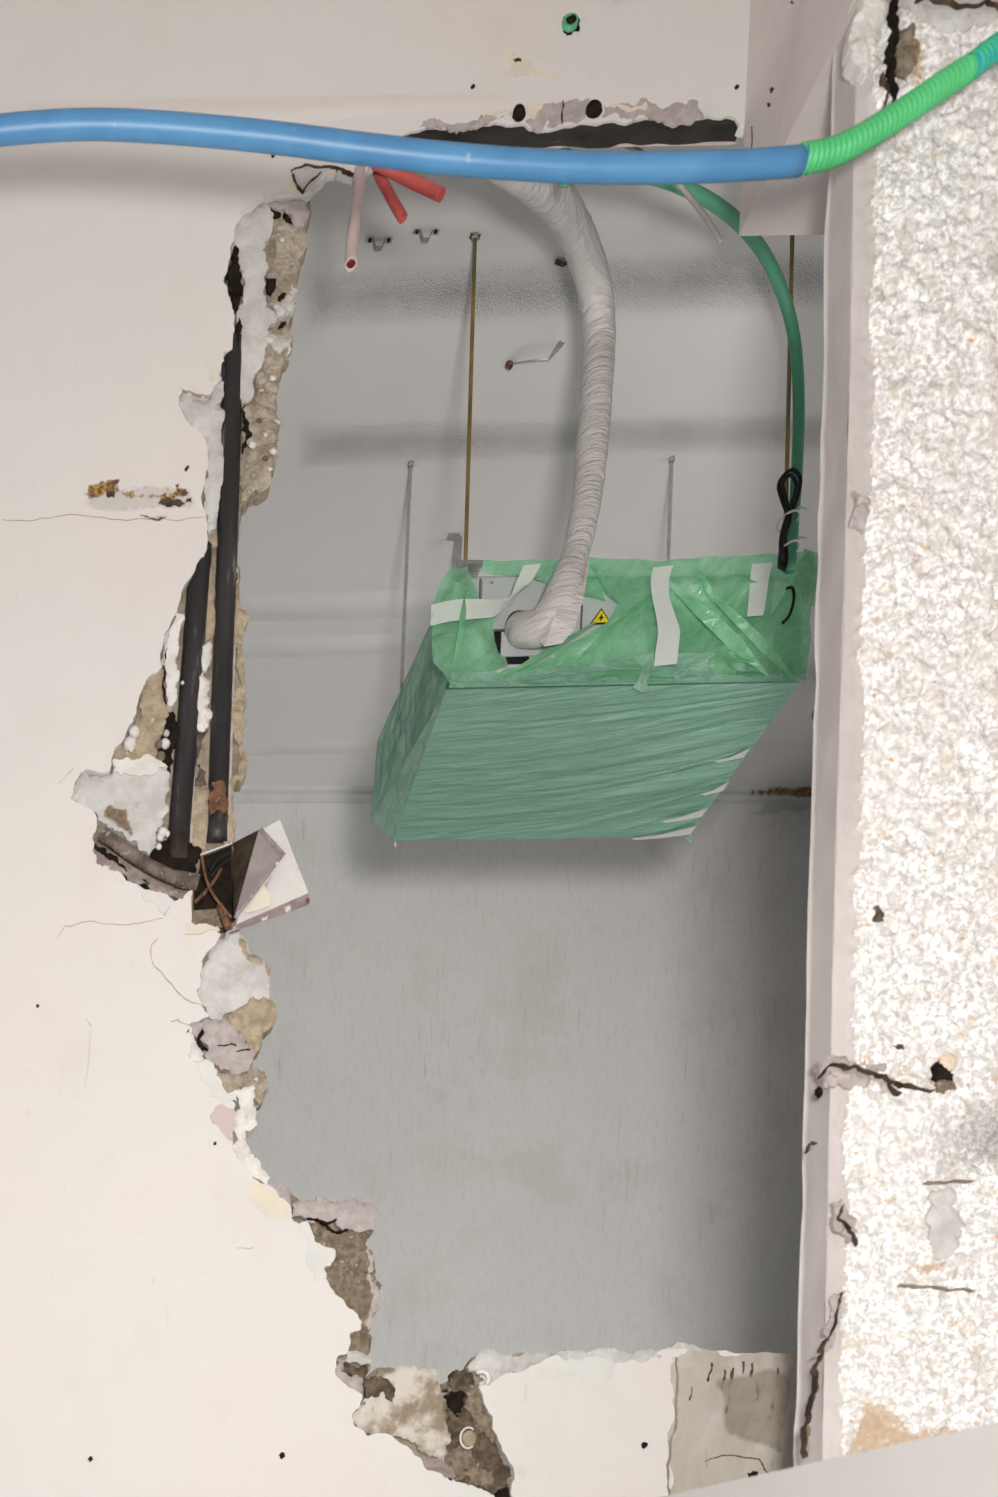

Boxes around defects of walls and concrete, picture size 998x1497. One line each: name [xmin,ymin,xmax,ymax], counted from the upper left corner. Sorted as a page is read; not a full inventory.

spalling [841,0,998,87]
crack [879,0,998,109]
spalling [420,98,720,134]
spalling [179,199,311,538]
rust [87,465,192,521]
spalling [157,711,180,773]
rust [751,787,812,798]
crack [814,1063,937,1099]
crack [804,1141,817,1155]
flaking render [185,922,843,1497]
crack [836,1204,858,1247]
crack [800,1291,844,1459]